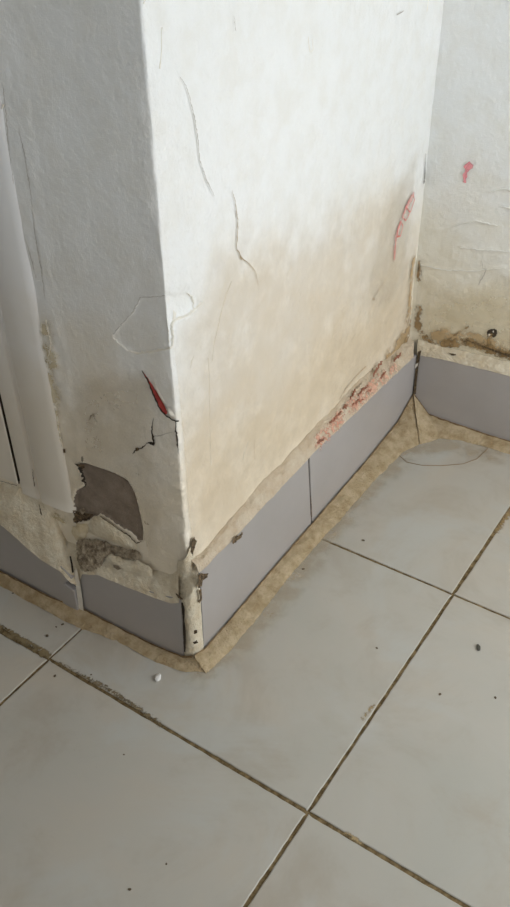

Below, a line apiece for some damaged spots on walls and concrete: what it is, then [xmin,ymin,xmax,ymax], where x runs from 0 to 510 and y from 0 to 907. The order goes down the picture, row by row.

crack [180,77,258,284]
crack [133,422,171,453]
peeling [314,352,402,447]
spalling [71,456,153,577]
peeling [197,573,209,603]